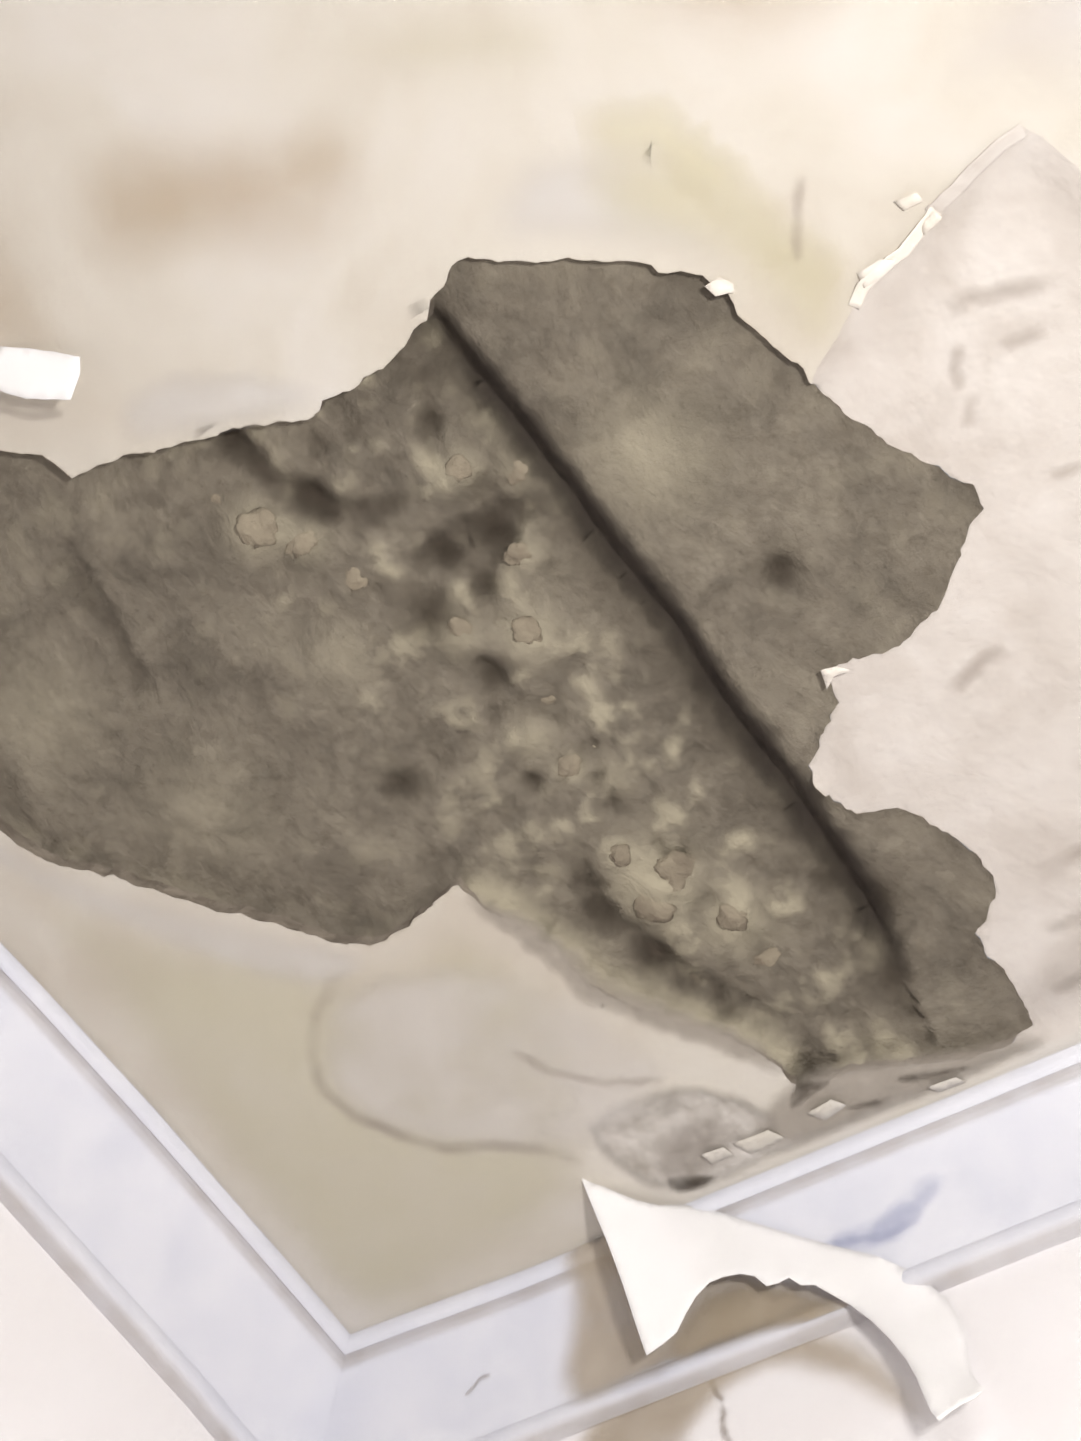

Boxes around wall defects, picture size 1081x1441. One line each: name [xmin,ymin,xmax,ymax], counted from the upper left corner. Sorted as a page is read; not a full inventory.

spalling [0,124,1081,1092]
peeling [702,1130,784,1164]
peeling [808,1099,846,1120]
peeling [582,1179,984,1421]